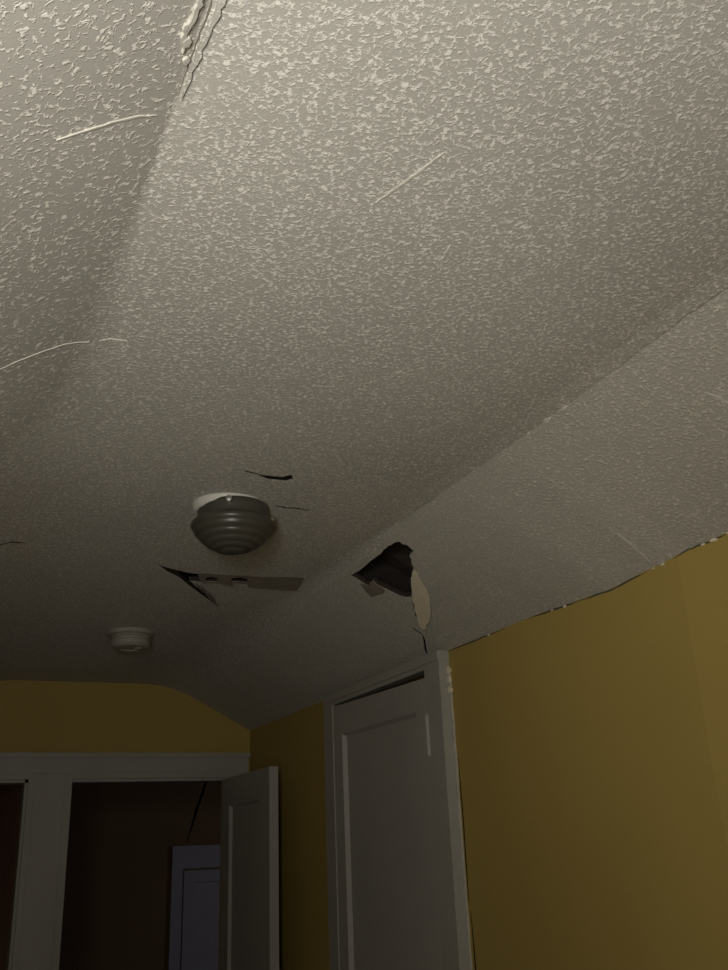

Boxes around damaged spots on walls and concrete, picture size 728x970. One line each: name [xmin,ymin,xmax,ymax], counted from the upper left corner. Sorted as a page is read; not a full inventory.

crack [244,470,293,481]
crack [159,565,305,606]
spalling [356,556,412,597]